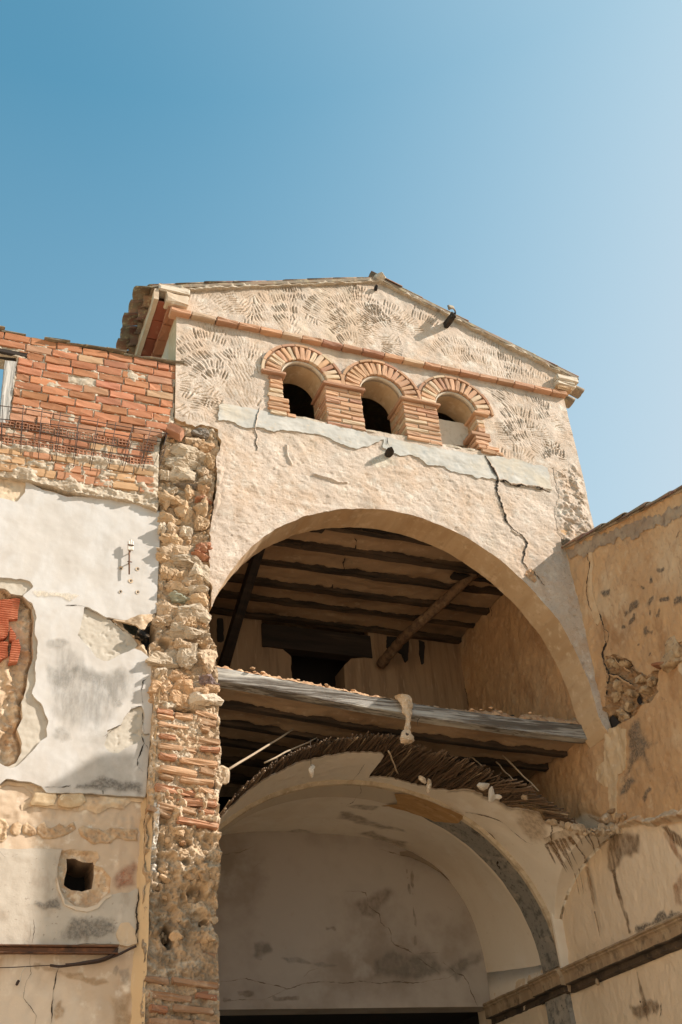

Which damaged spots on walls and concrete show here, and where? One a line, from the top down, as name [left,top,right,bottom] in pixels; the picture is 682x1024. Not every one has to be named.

spalling [0,395,169,472]
peeling [0,480,26,502]
crack [484,455,551,585]
spalling [0,579,155,814]
damp [545,830,673,934]
crack [23,926,58,1022]
crack [221,891,476,1002]